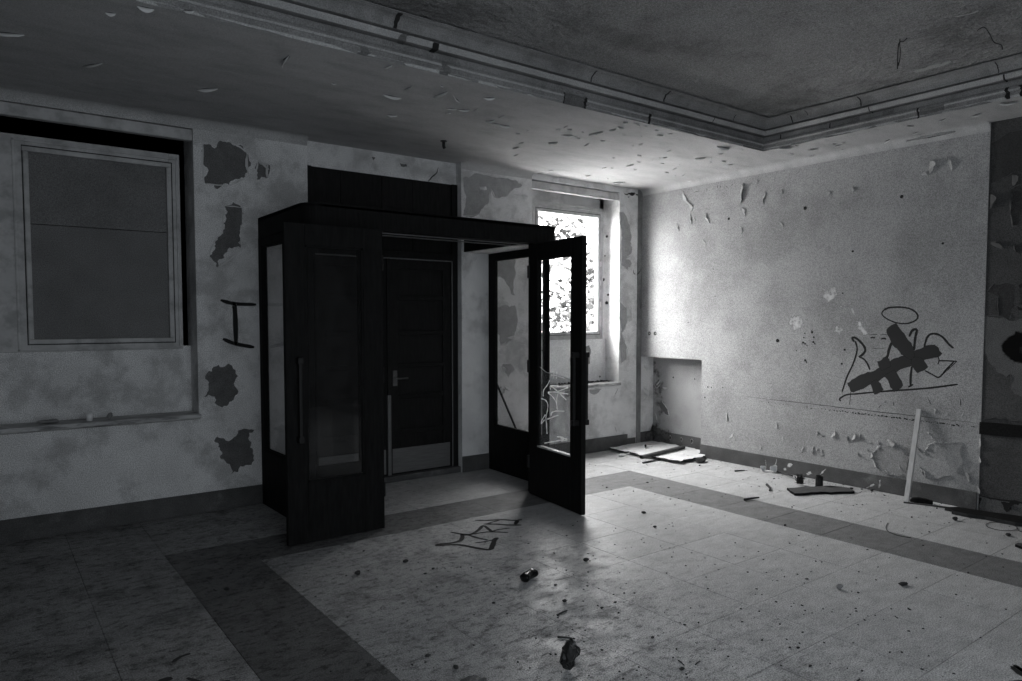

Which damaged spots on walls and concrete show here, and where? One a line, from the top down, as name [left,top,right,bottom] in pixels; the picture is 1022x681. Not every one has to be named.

peeling [201,141,271,189]
peeling [549,122,672,167]
peeling [463,173,528,217]
peeling [209,202,243,268]
peeling [984,283,1022,396]
peeling [204,364,238,407]
peeling [214,429,254,473]
peeling [847,433,909,476]
spalling [966,473,1022,516]